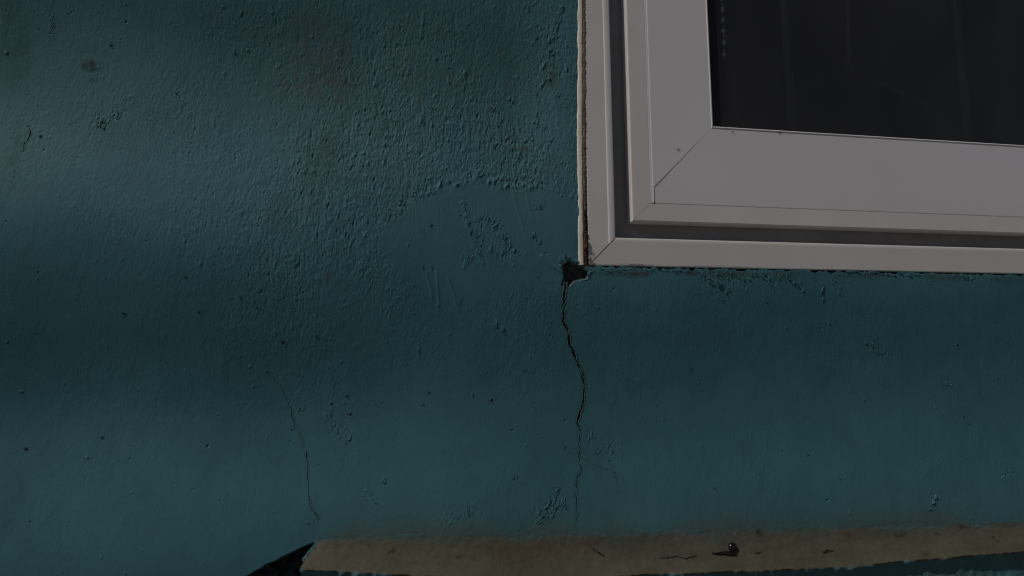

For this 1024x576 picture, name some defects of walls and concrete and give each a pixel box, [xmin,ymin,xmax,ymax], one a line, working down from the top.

spalling [559,254,699,289]
crack [560,282,621,556]